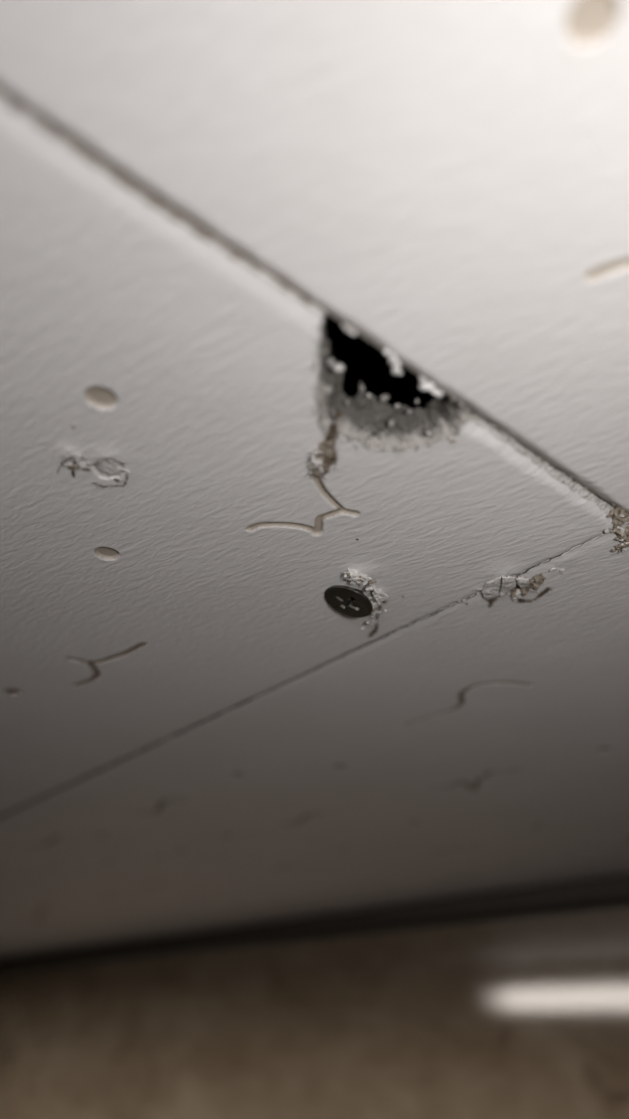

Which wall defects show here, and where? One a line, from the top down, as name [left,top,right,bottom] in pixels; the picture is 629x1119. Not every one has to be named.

hole [308,309,480,455]
spalling [57,455,130,488]
crack [304,403,342,517]
spalling [604,507,629,554]
peeling [344,568,388,637]
spalling [458,568,565,607]